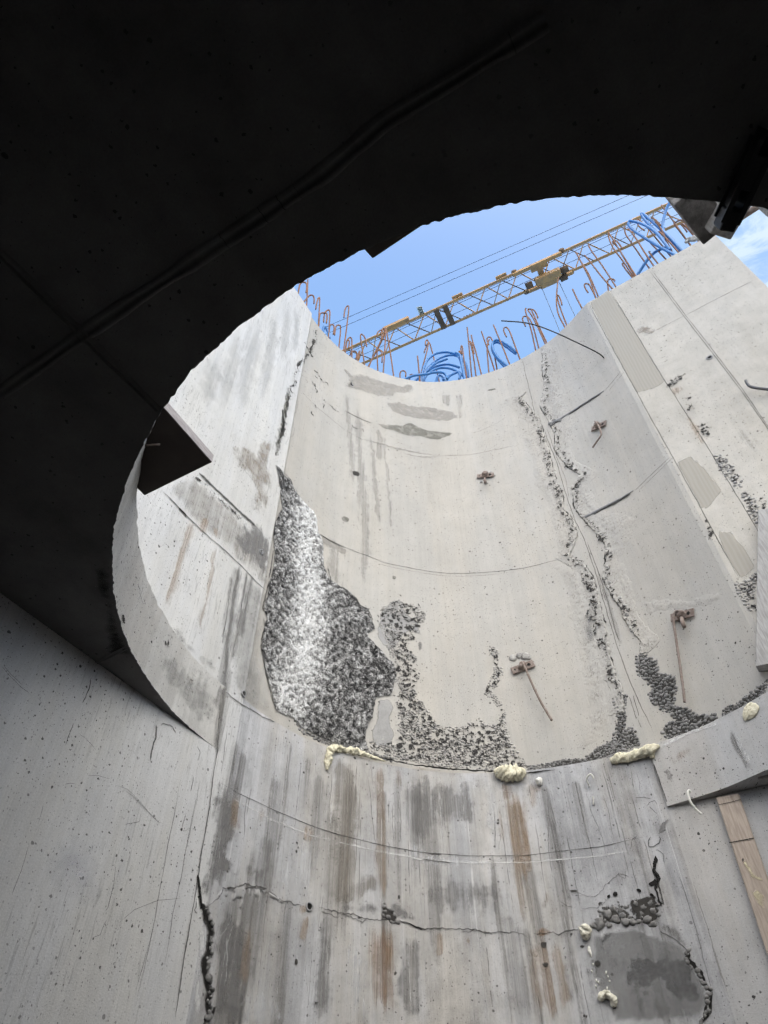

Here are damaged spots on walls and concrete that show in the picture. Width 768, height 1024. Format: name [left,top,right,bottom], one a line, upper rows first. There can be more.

spalling [519,308,640,694]
spalling [261,465,397,751]
leakage [205,797,258,893]
leakage [328,764,359,903]
leakage [409,783,475,835]
leakage [217,908,257,1024]
crack [194,856,664,1024]
spalling [590,889,713,1024]